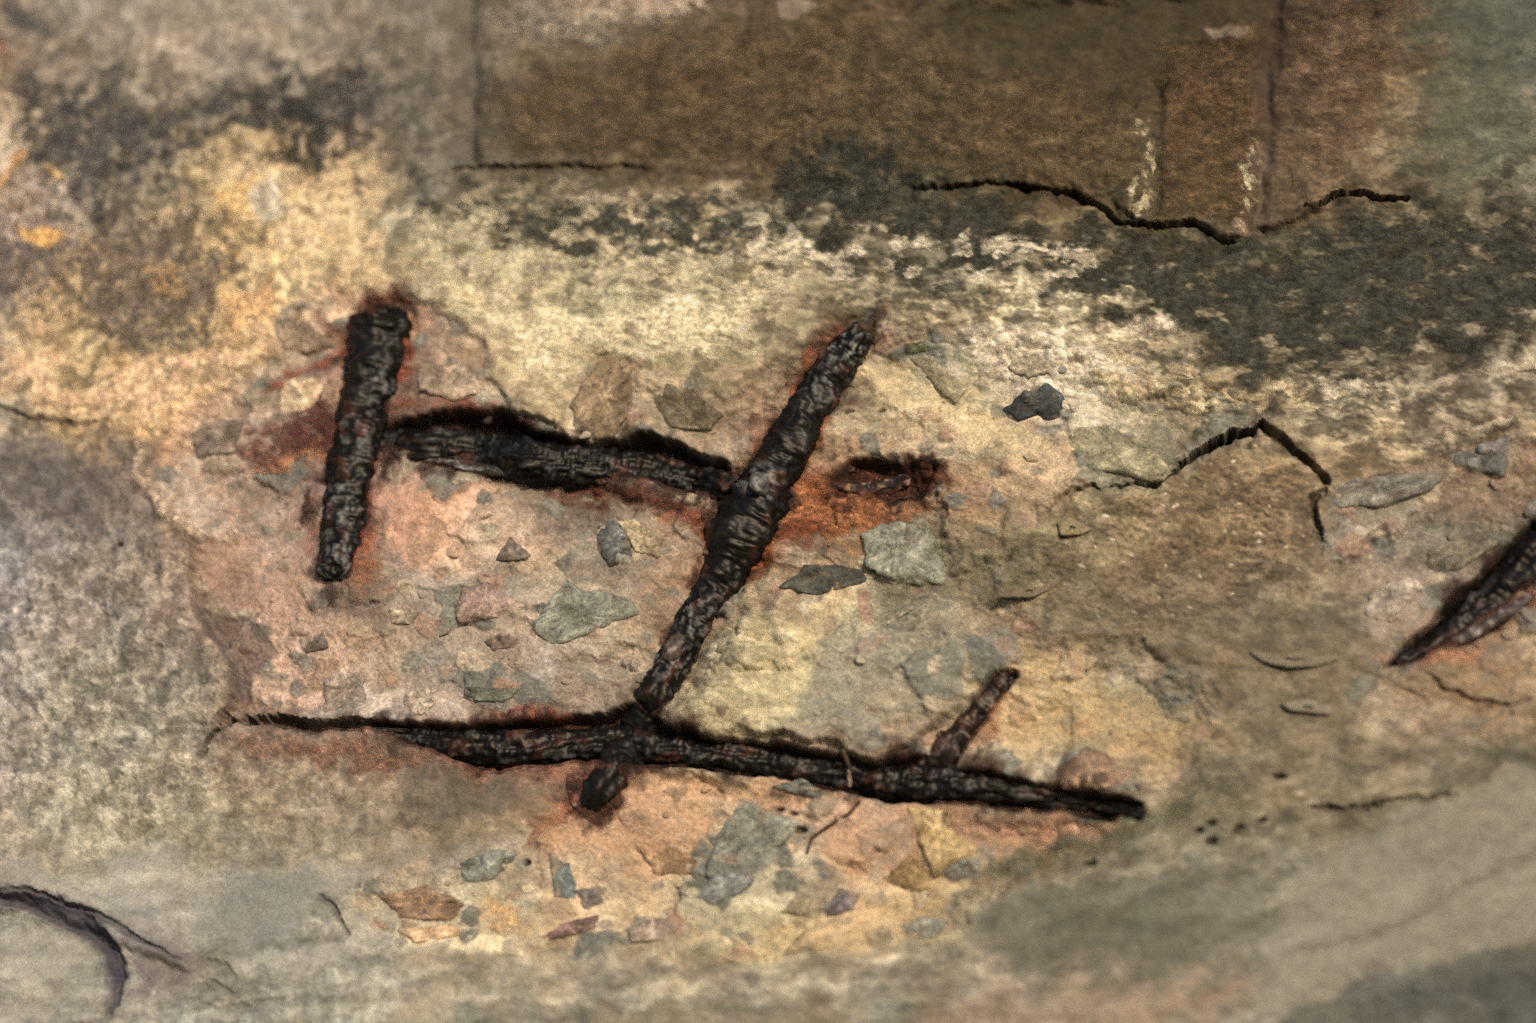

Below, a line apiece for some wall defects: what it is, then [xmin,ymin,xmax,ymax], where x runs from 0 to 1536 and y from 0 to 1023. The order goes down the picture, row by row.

crack [912,178,1236,246]
crack [1303,188,1411,209]
crack [0,404,115,428]
corrosion [238,400,337,523]
corrosion [308,396,583,615]
corrosion [547,473,720,588]
corrosion [747,390,958,581]
crack [1042,418,1332,542]
spalling [144,287,1274,970]
corrosion [237,710,683,828]
corrosion [470,703,708,742]
crack [0,884,286,1023]